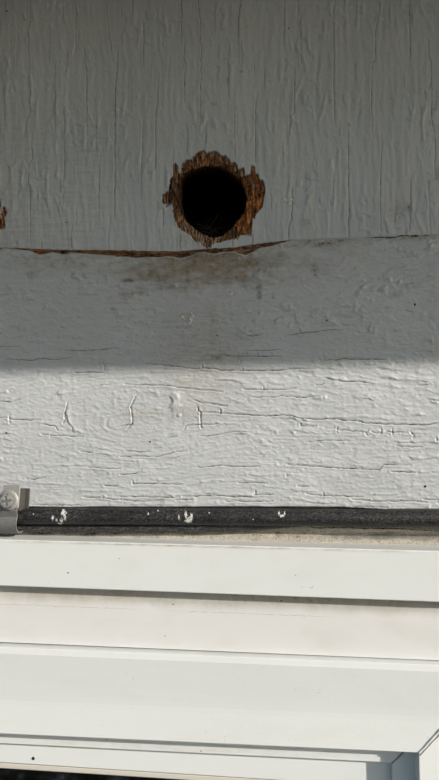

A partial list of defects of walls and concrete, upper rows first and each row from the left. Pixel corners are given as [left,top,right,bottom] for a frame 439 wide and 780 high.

crack [372,106,436,238]
crack [129,330,437,447]
crack [0,400,270,506]
crack [294,464,412,473]
crack [301,486,432,508]